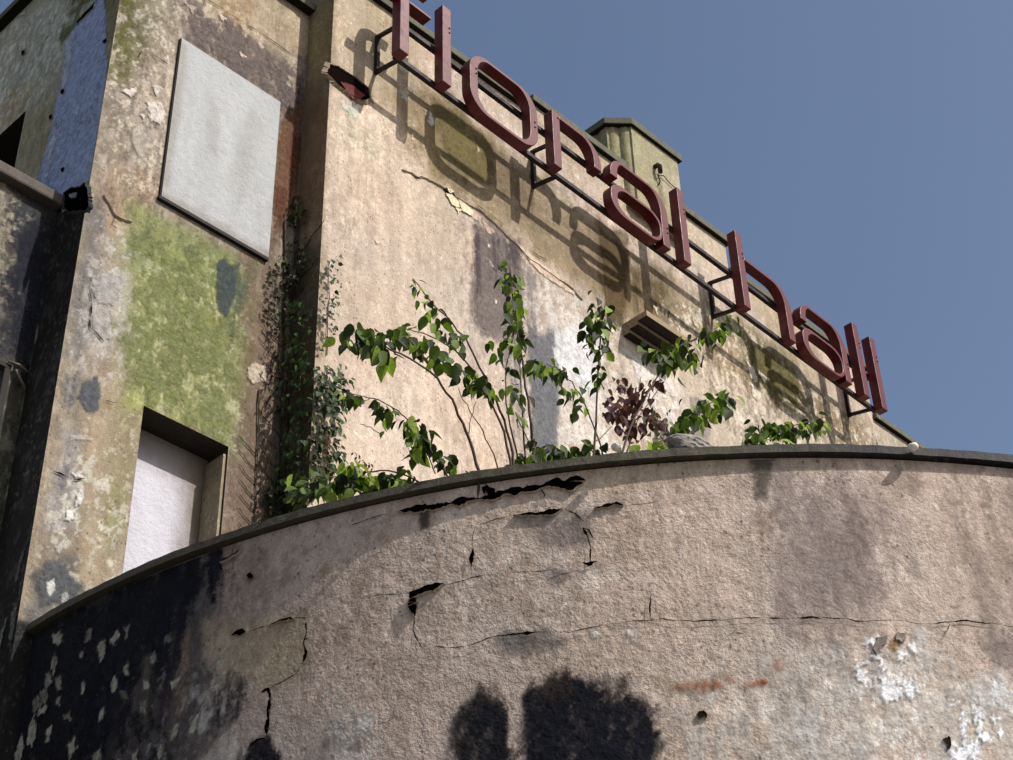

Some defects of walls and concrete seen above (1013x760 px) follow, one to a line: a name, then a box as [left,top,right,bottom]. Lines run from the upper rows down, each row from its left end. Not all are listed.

spalling [76,0,97,25]
spalling [321,61,374,106]
leakage [0,216,43,352]
leakage [217,258,247,322]
crack [402,169,583,301]
crack [350,475,1012,652]
peeling [14,659,61,760]
peeling [97,631,120,662]
leakage [13,548,245,760]
crack [231,610,333,747]
leakage [449,667,665,760]
peeling [873,632,906,655]